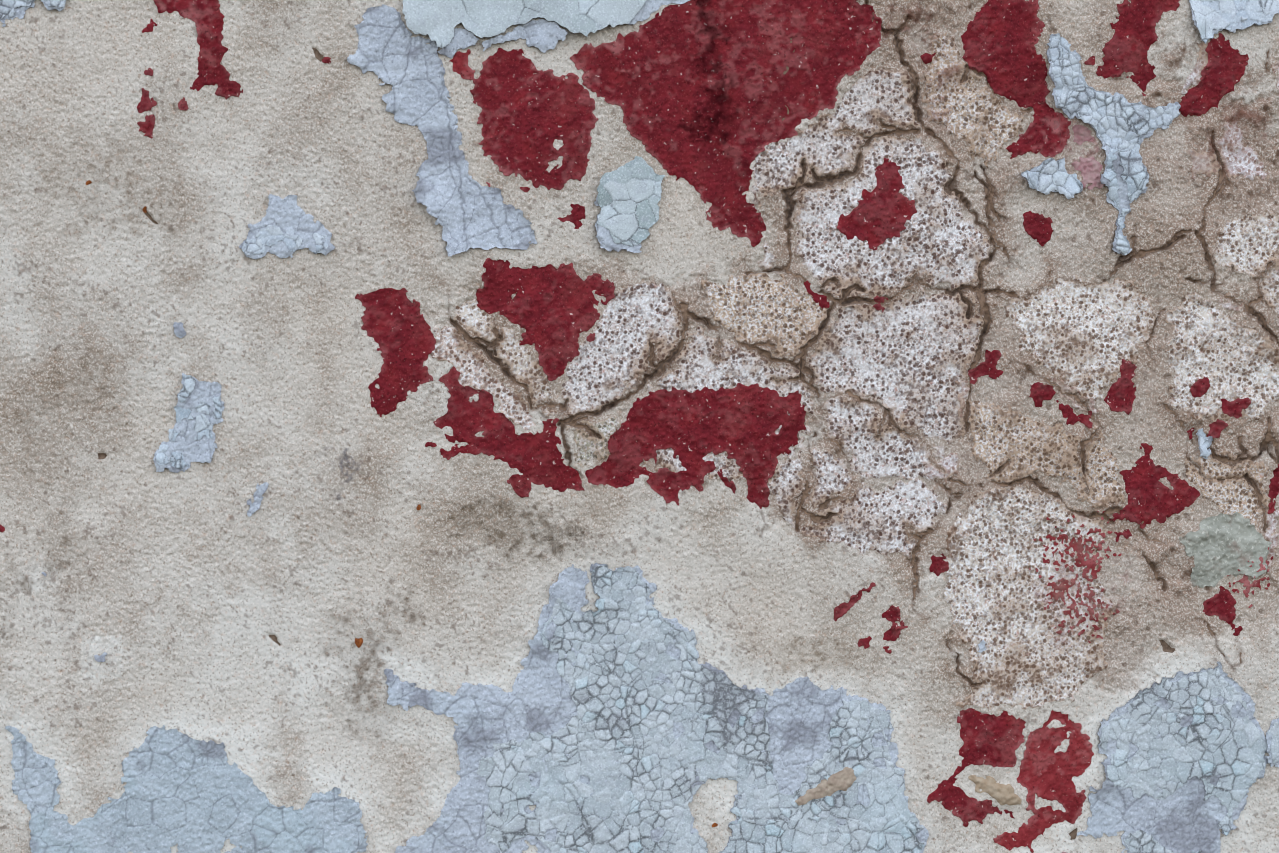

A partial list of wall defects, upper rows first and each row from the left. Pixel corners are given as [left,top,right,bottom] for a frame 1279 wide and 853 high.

peeling [347,0,690,256]
crack [450,1,1018,532]
spalling [430,0,1279,710]
crack [907,461,1166,600]
crack [1024,364,1096,480]
crack [1110,131,1279,345]
crack [1163,404,1279,541]
peeling [5,725,368,853]
peeling [384,563,929,853]
crack [946,643,982,687]
spalling [968,775,1022,819]
peeling [1069,661,1279,853]